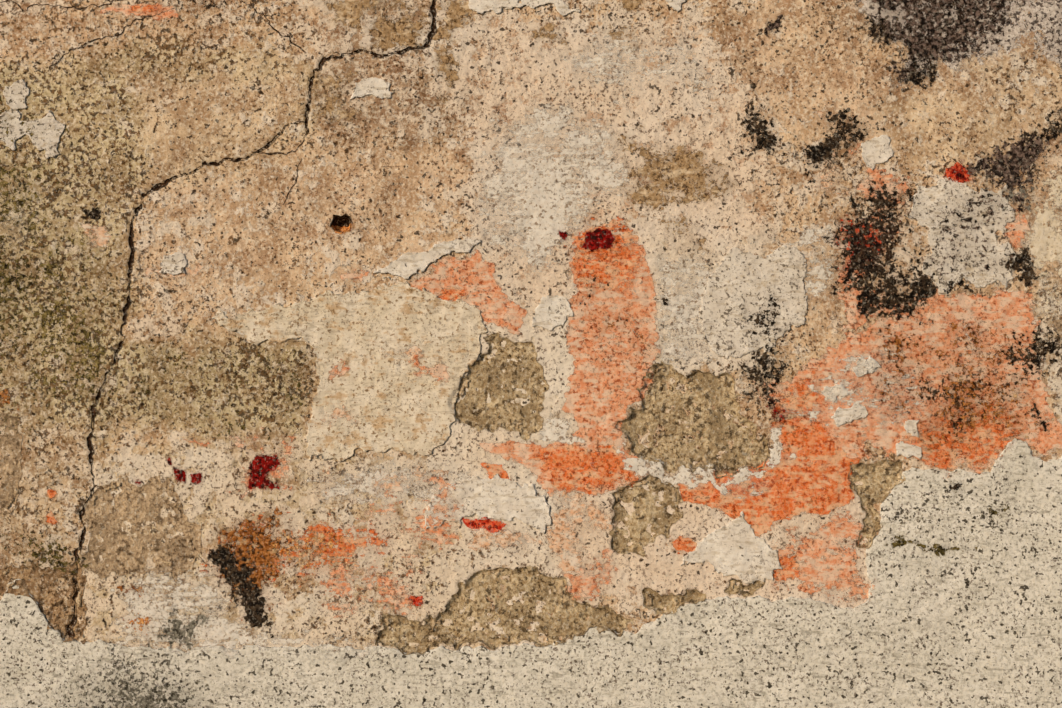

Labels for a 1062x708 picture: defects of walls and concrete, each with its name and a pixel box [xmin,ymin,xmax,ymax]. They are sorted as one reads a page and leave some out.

peeling [100,3,178,20]
flaking render [310,69,392,128]
peeling [324,0,580,104]
flaking render [622,0,643,12]
peeling [563,25,711,104]
mould [855,0,1062,100]
water stain [80,206,101,220]
crack [67,0,436,638]
mould [823,110,1062,460]
peeling [0,104,1062,658]